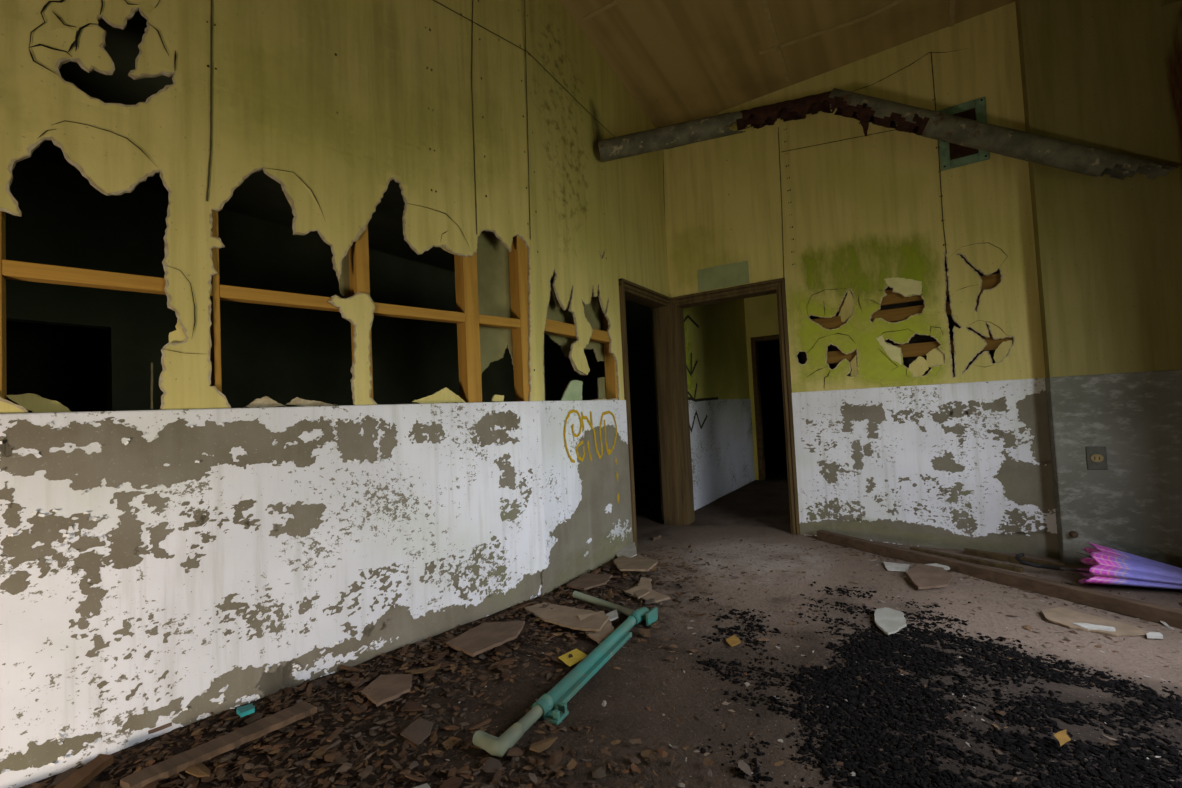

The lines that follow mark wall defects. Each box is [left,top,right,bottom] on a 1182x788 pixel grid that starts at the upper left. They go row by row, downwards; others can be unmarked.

spalling [796,242,1015,386]
peeling [0,120,633,736]
peeling [800,390,1059,558]
peeling [0,732,102,774]